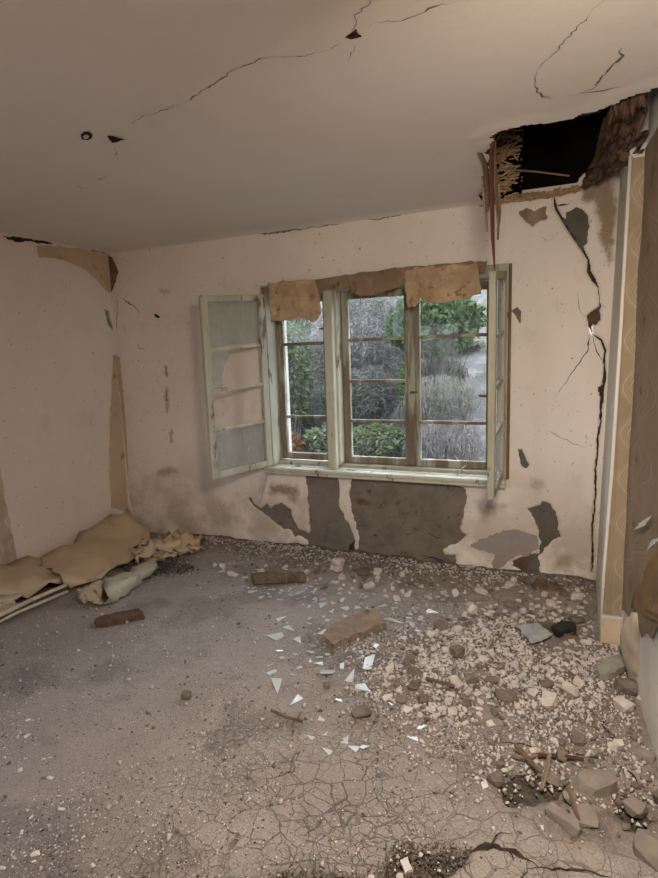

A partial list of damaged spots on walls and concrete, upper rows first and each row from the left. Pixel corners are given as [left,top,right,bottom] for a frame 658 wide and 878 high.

crack [133,0,468,123]
crack [534,0,604,99]
crack [574,47,625,96]
flaking render [581,93,649,189]
flaking render [519,206,548,226]
flaking render [564,207,589,250]
flaking render [587,305,601,326]
crack [550,198,606,571]
flaking render [249,476,561,571]
crack [501,723,546,747]
crack [553,711,646,789]
crack [462,832,642,878]